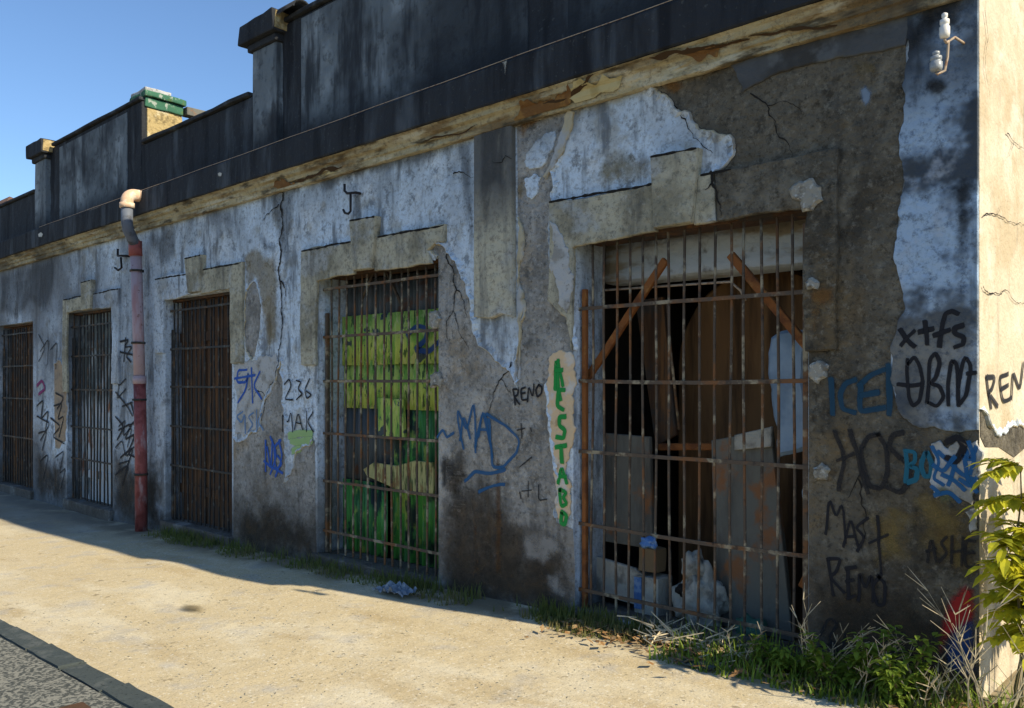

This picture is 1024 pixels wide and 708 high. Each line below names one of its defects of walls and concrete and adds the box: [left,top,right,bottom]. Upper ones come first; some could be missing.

crack [750,93,801,155]
spalling [232,279,317,560]
crack [253,166,342,419]
crack [446,254,469,350]
leakage [442,459,558,610]
spalling [428,74,622,611]
spalling [642,46,1024,696]